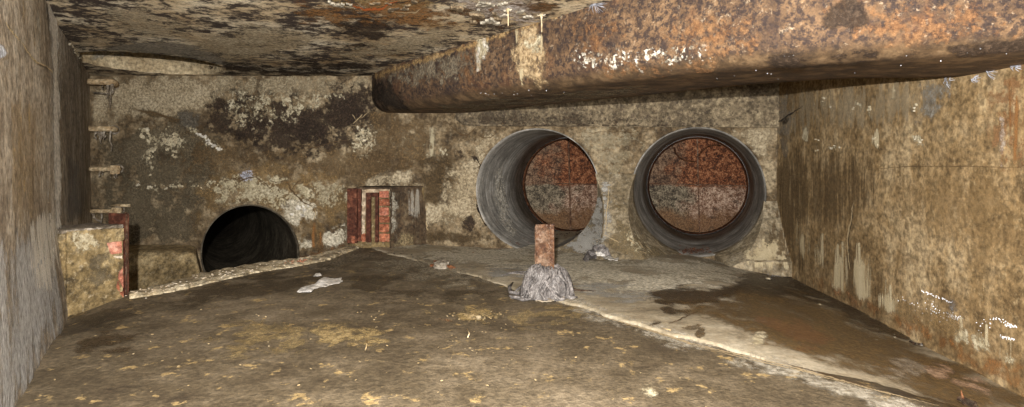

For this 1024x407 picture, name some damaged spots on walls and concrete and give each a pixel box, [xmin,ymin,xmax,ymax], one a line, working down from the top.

corrosion [296,0,456,27]
corrosion [671,19,757,73]
corrosion [853,7,980,46]
damp [0,0,650,407]
damp [510,151,910,349]
damp [950,301,989,351]
damp [730,354,916,407]